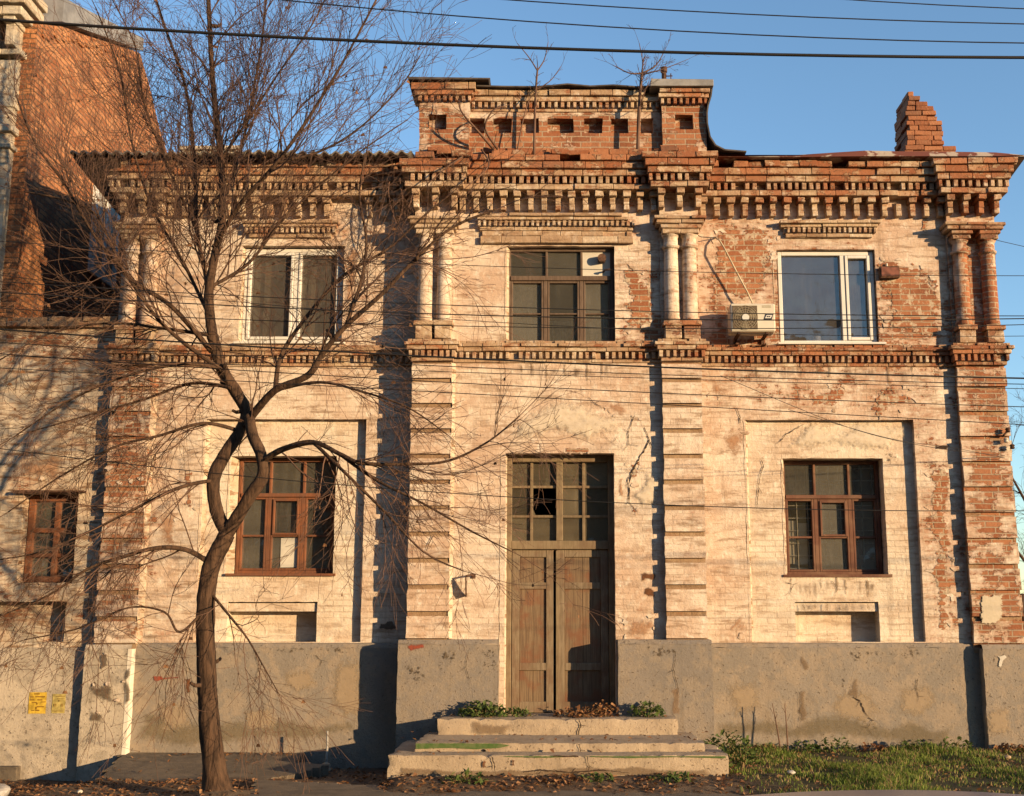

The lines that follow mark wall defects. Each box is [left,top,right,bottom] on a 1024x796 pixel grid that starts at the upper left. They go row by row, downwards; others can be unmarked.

peeling [622,264,655,334]
peeling [707,225,780,311]
peeling [877,257,947,336]
peeling [105,449,144,485]
crack [588,397,652,508]
peeling [924,470,958,630]